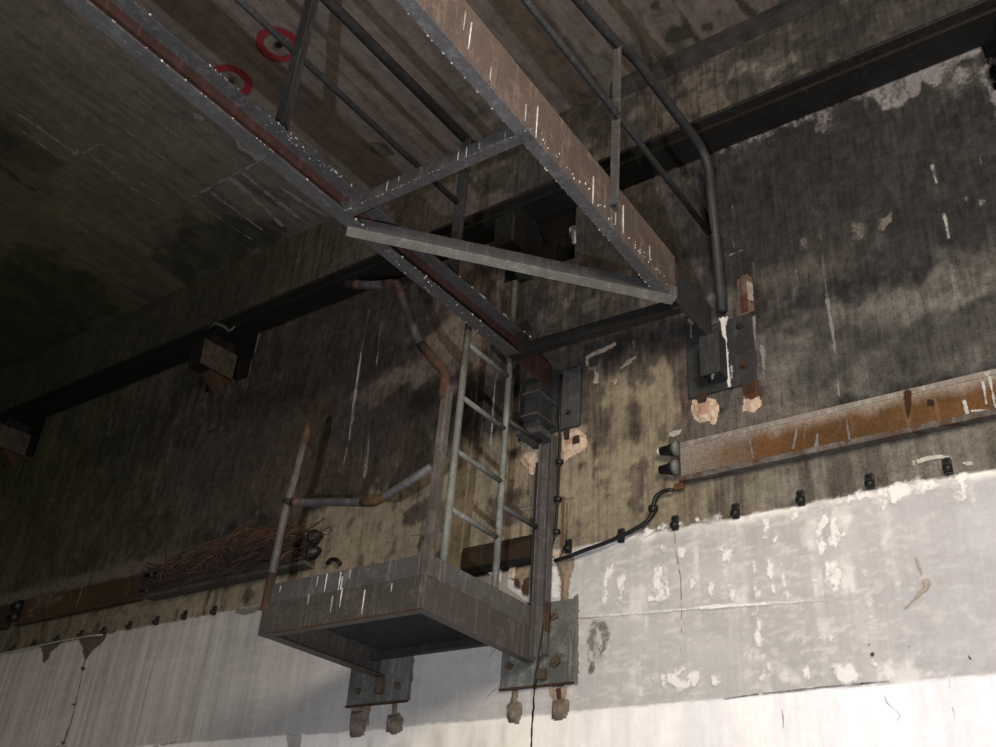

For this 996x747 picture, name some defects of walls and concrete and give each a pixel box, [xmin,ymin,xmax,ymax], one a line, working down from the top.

water stain [825,294,837,354]
spalling [691,392,719,425]
spalling [742,379,762,413]
corrosion [904,390,912,419]
spalling [520,443,539,475]
spalling [561,427,587,462]
peeling [647,547,686,602]
peeling [766,558,791,605]
peeling [812,515,847,597]
peeling [831,662,859,685]
crack [61,658,85,746]
crack [528,690,536,747]